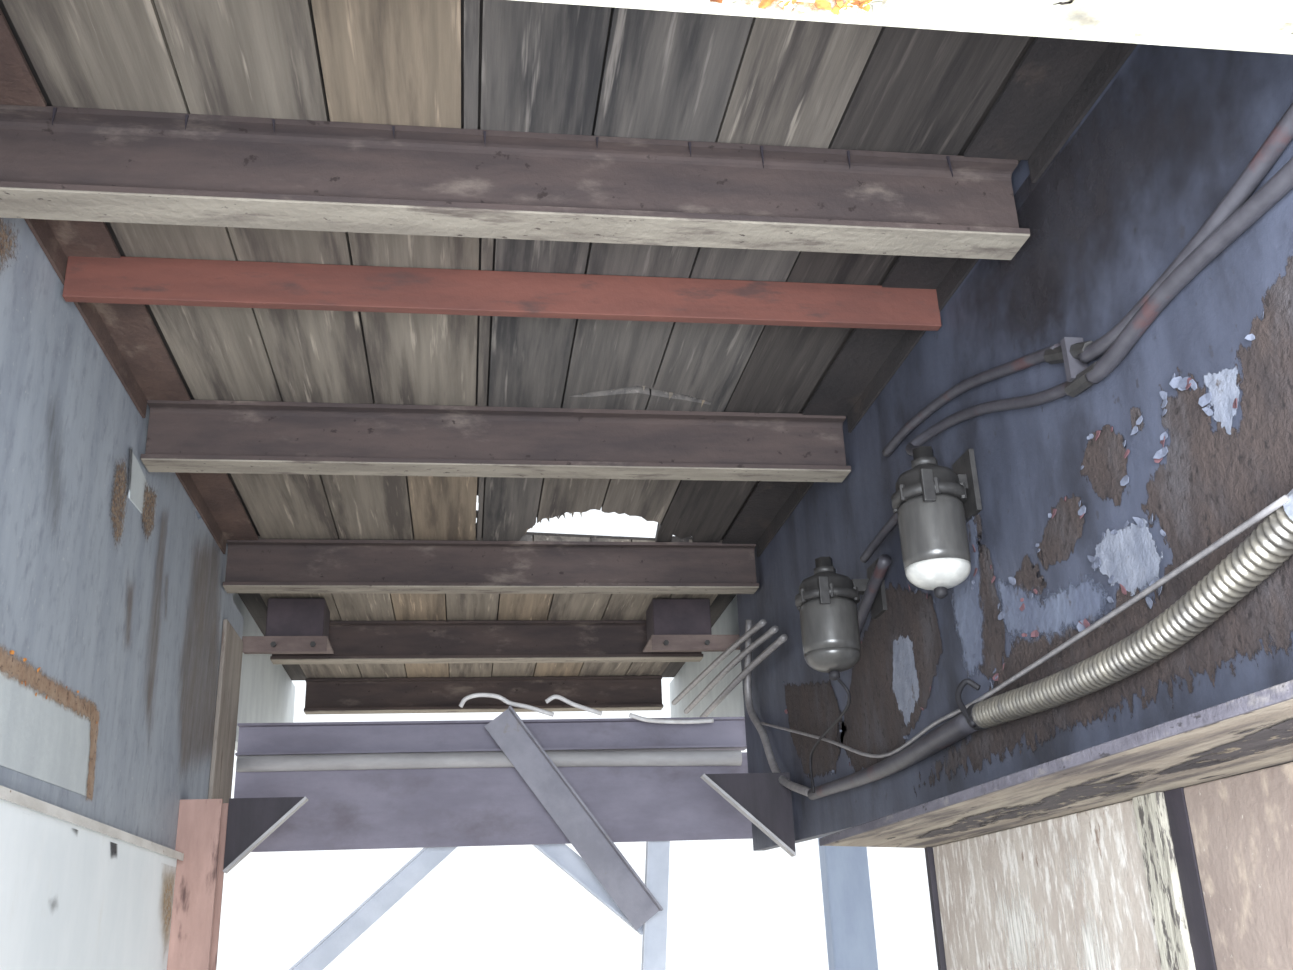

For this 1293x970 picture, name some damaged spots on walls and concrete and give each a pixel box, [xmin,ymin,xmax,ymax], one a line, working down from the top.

corrosion [751,0,882,17]
peeling [951,256,1293,699]
peeling [783,582,943,778]
peeling [914,554,1293,799]
peeling [908,719,1293,841]